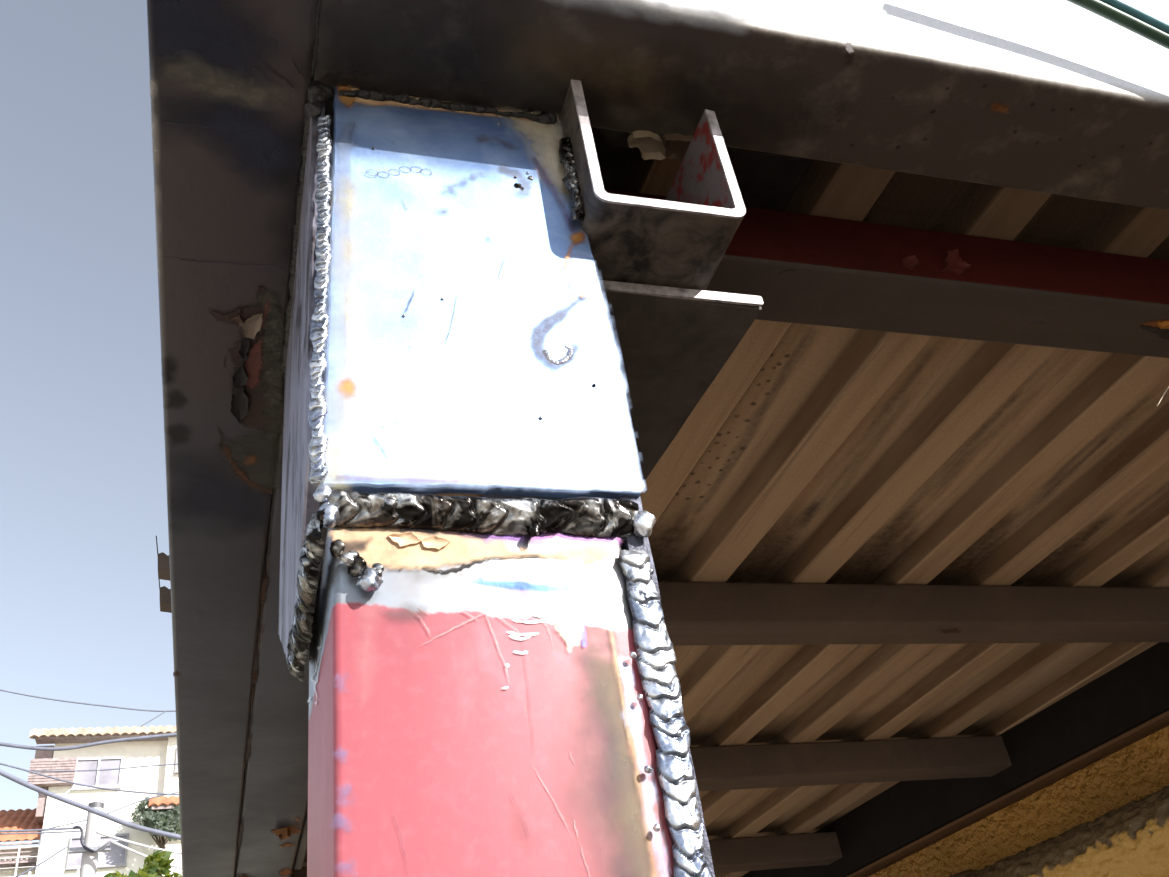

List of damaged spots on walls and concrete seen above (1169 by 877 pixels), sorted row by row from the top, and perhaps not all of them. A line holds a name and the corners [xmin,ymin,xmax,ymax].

peeling [209,286,285,435]